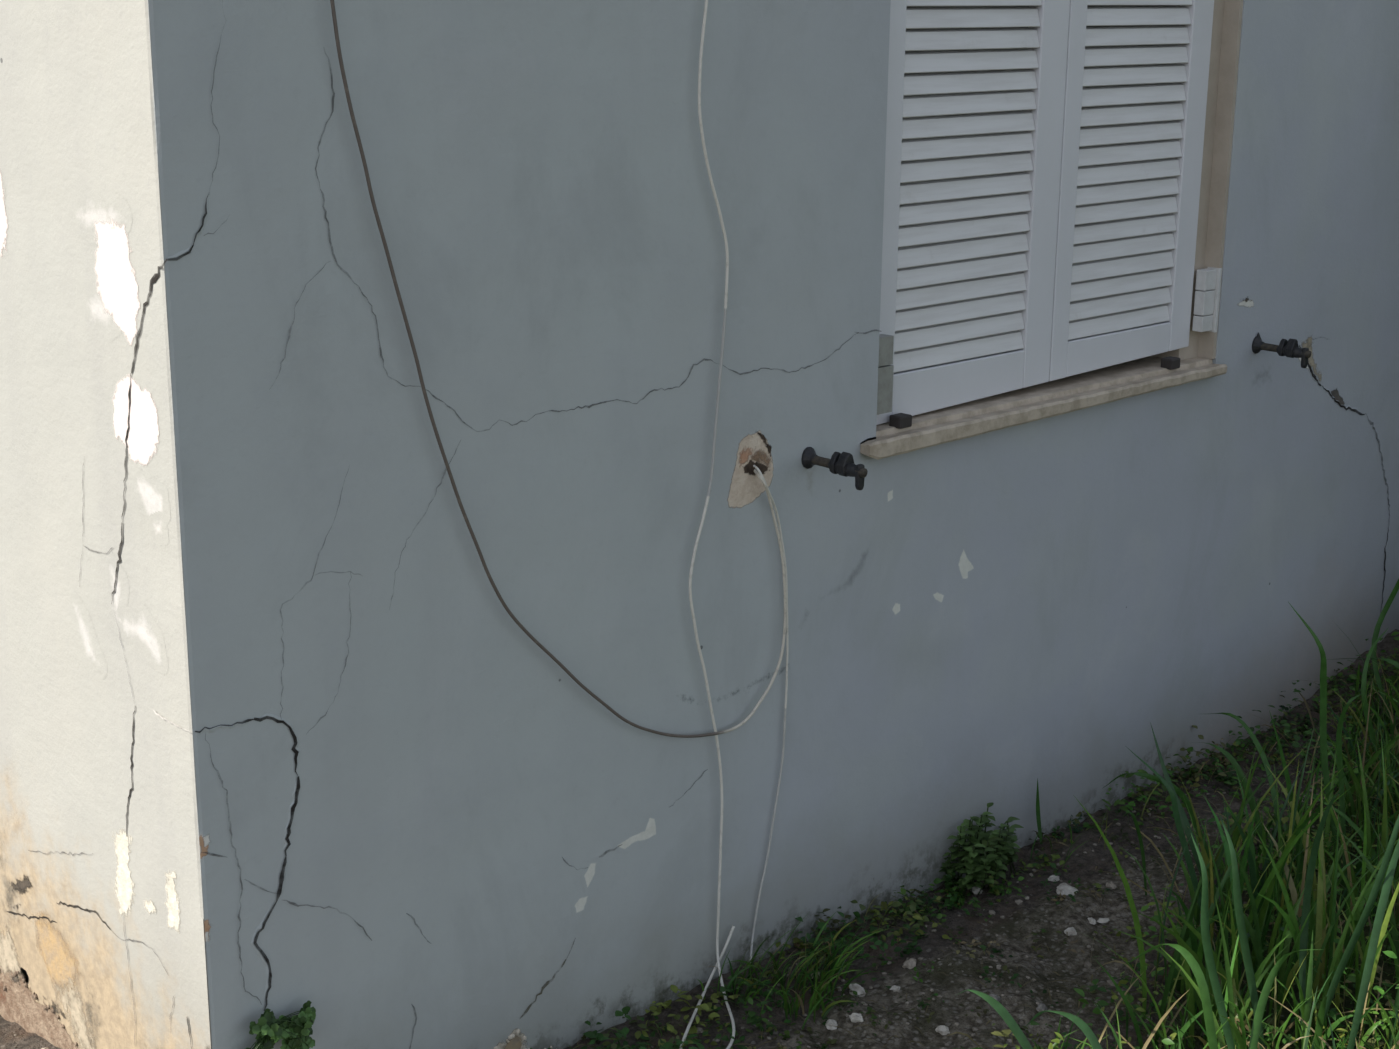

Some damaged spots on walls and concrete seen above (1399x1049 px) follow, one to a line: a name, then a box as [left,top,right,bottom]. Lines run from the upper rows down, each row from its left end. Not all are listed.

peeling [0,172,8,256]
peeling [69,188,140,345]
peeling [112,375,171,547]
crack [79,144,220,645]
crack [509,330,881,426]
spalling [728,430,773,508]
crack [1299,345,1390,613]
leakage [0,699,211,1049]
crack [126,682,327,1011]
peeling [571,858,599,918]
peeling [614,813,659,853]